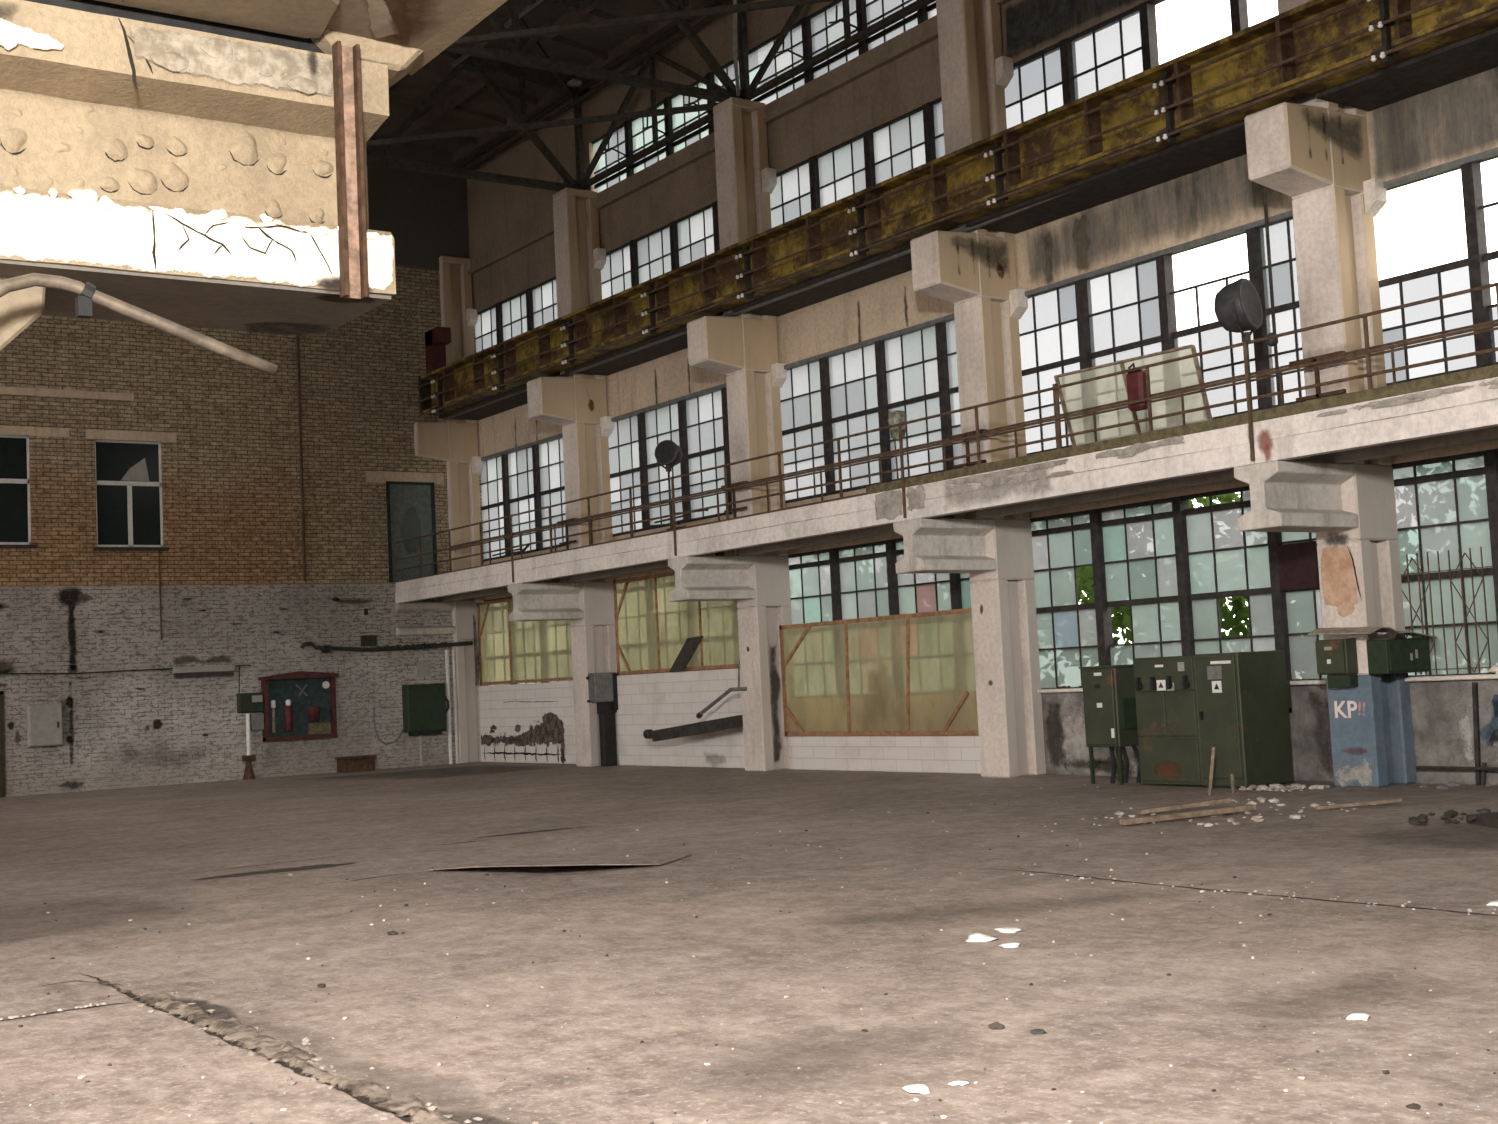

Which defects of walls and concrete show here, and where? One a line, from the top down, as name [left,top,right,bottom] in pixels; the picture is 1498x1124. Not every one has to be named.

peeling [0,18,63,50]
crack [118,18,153,90]
spalling [130,25,333,96]
damp [1006,0,1132,57]
damp [1307,67,1498,178]
peeling [0,186,340,286]
crack [152,210,332,274]
peeling [366,232,394,290]
flaking render [1321,547,1358,617]
spalling [481,712,566,763]
peeling [1460,695,1498,765]